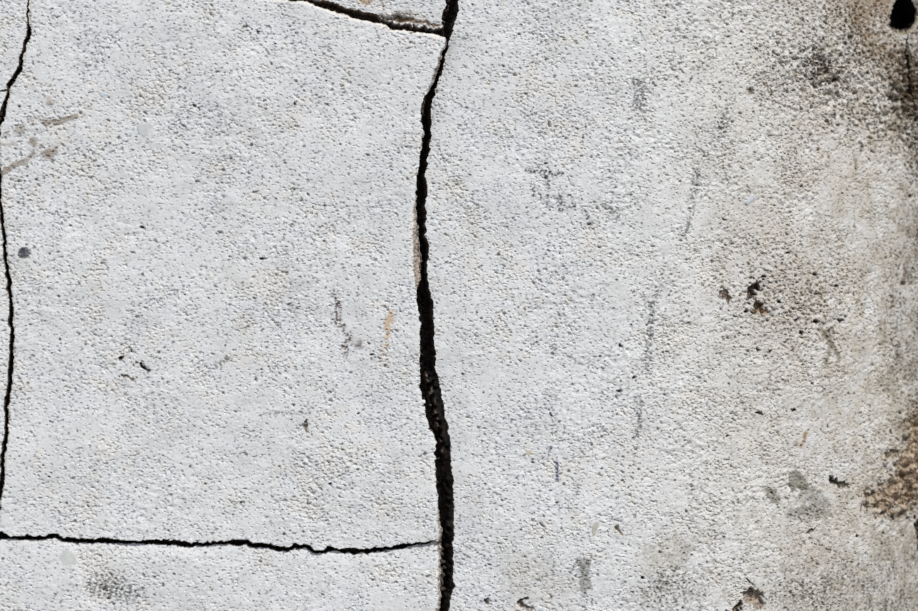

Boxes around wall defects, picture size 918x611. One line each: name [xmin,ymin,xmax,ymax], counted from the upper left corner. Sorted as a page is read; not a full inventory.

crack [0,0,459,611]
crack [903,28,918,121]